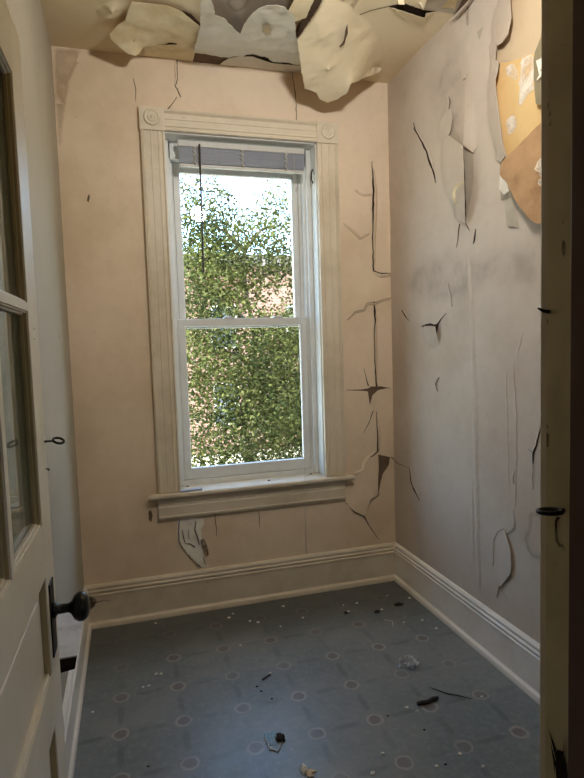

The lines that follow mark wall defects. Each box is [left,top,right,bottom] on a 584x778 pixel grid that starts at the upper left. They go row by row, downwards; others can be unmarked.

peeling [419,0,473,26]
peeling [110,0,389,103]
crack [167,60,181,109]
crack [413,123,436,181]
crack [343,161,391,278]
crack [345,298,420,540]
spalling [177,517,209,567]